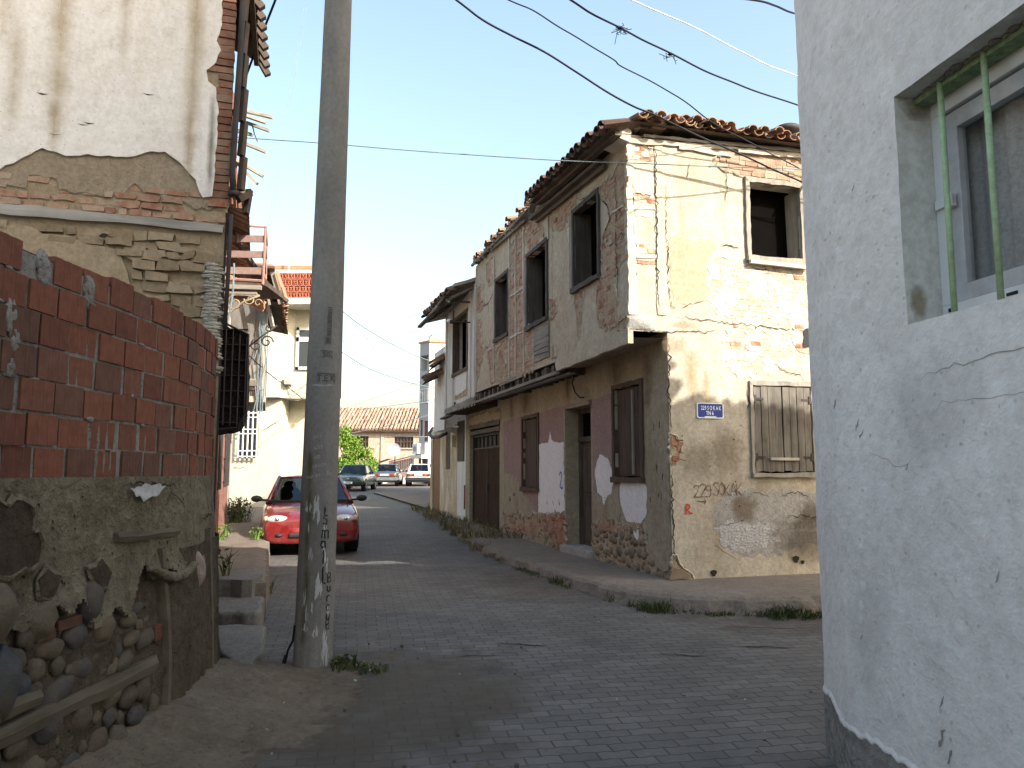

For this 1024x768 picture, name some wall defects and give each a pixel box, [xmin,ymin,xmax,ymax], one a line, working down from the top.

spalling [0,174,83,196]
spalling [97,183,215,212]
spalling [709,150,802,183]
spalling [573,144,656,340]
spalling [454,193,578,400]
spalling [705,253,810,380]
crack [579,146,801,572]
crack [919,347,1023,383]
crack [926,392,1023,422]
spalling [502,472,568,549]
spalling [0,493,68,615]
spalling [86,557,113,590]